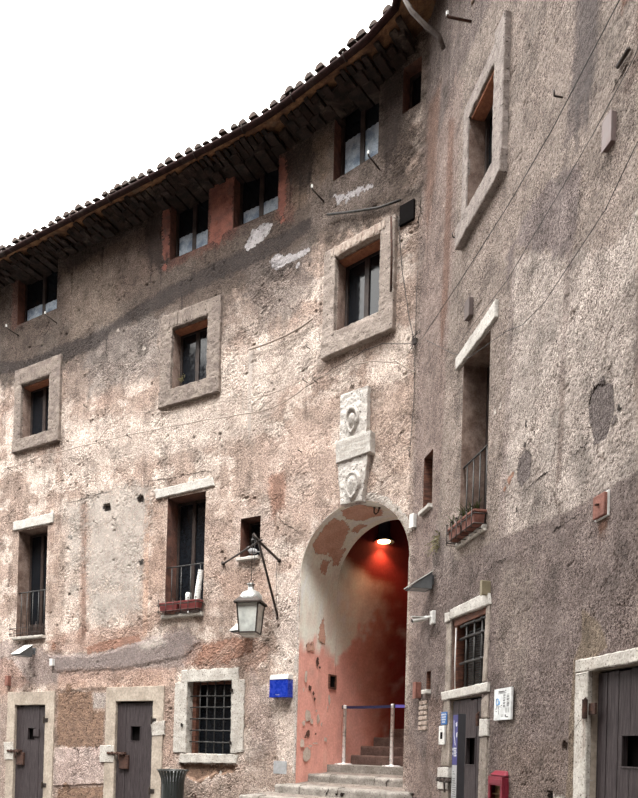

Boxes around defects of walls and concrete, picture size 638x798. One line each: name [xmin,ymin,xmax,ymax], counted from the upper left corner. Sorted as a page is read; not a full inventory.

flaking render [245,156,288,251]
flaking render [333,183,373,206]
peeling [313,492,412,575]
flaking render [292,583,330,774]